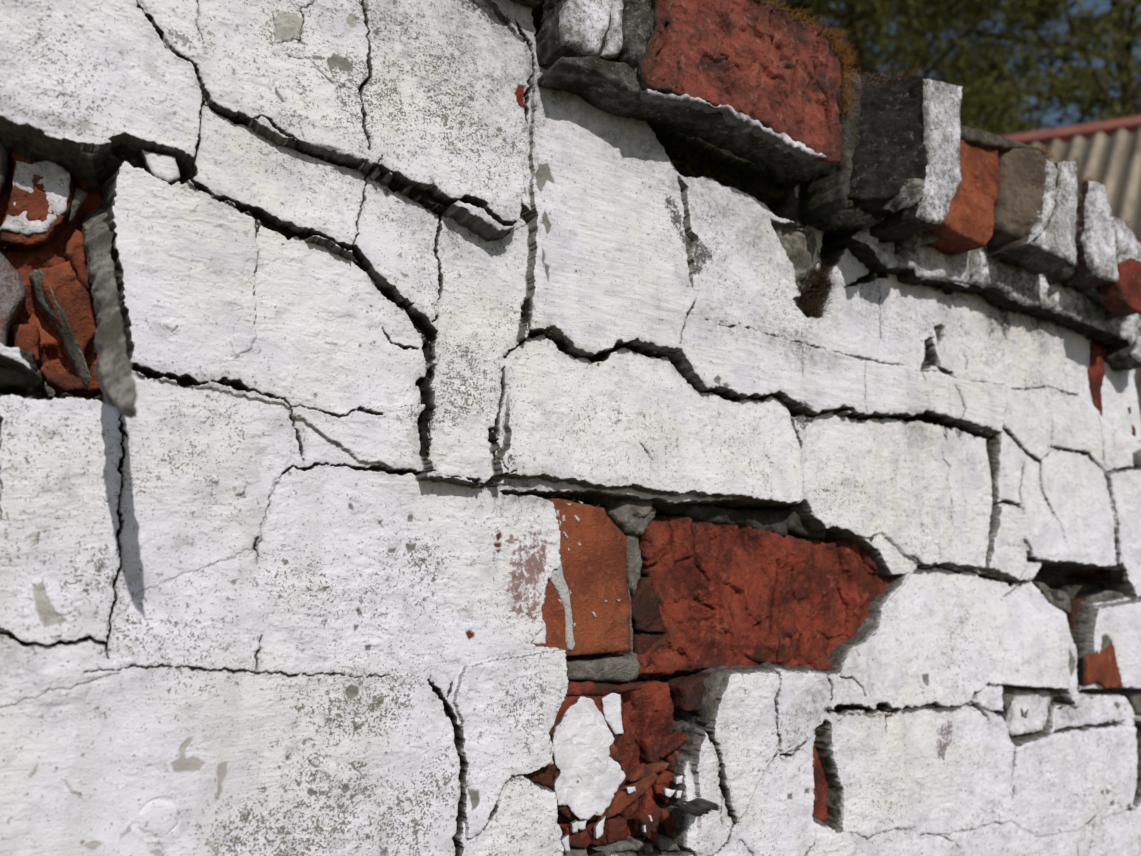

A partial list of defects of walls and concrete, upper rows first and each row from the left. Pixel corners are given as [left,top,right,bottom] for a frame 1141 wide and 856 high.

spalling [140,149,180,185]
spalling [0,143,137,418]
crack [132,1,677,487]
crack [693,362,1038,462]
spalling [1087,340,1105,416]
peeling [34,583,65,626]
crack [0,415,384,677]
spalling [524,494,892,856]
crack [827,676,998,728]
spalling [1069,635,1122,689]
crack [429,683,496,856]
crack [704,730,751,853]